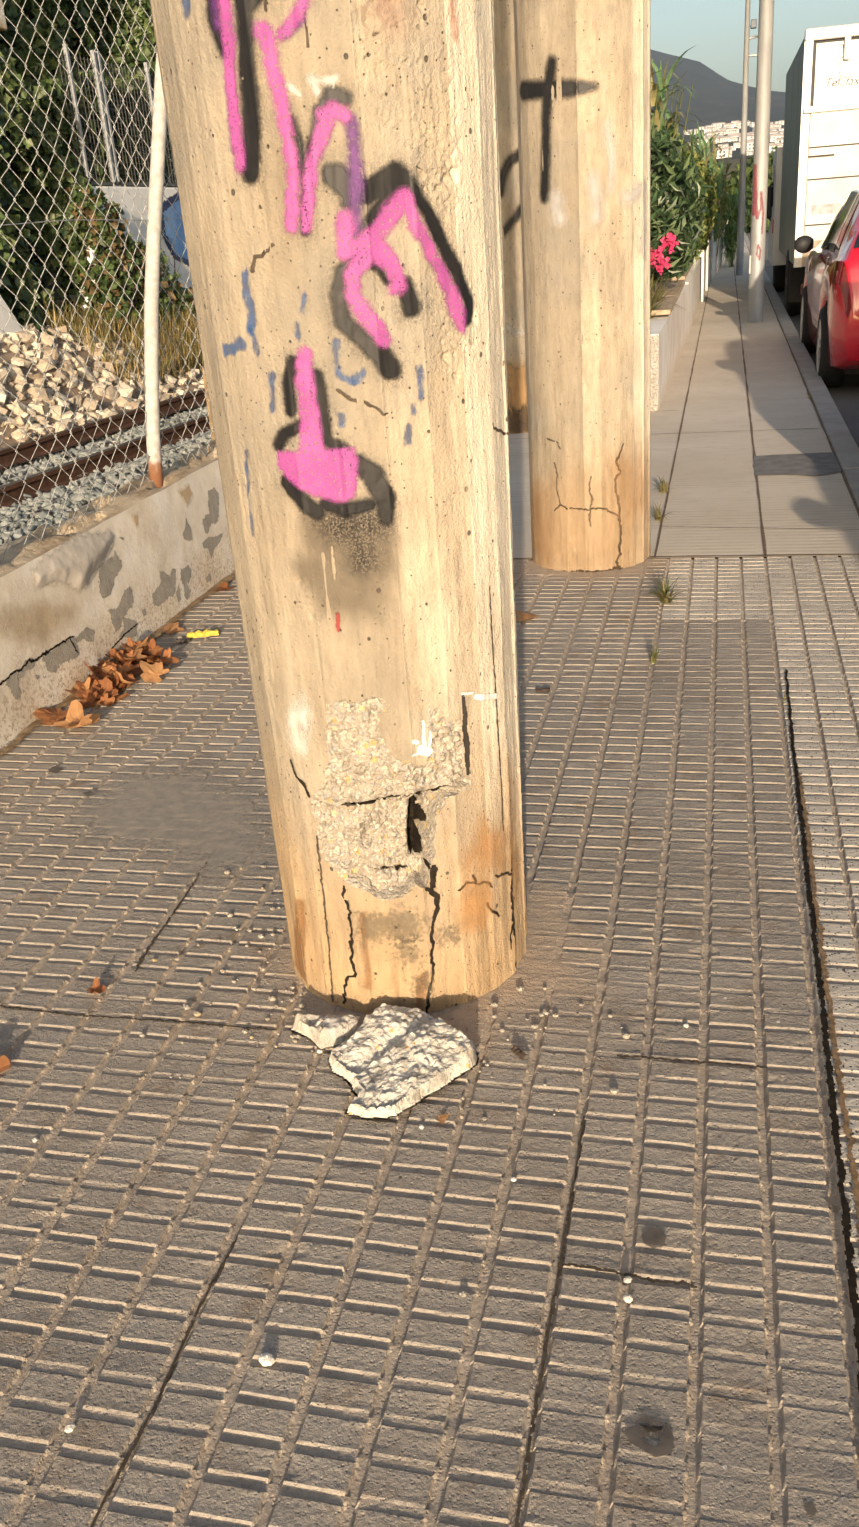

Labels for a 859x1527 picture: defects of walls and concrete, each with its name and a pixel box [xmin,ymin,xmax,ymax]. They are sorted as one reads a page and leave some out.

crack [492,423,508,435]
flaking render [98,488,223,638]
crack [547,438,624,572]
flaking render [5,627,94,700]
crack [0,623,138,685]
crack [290,760,310,798]
spalling [308,695,472,901]
crack [425,587,516,1013]
crack [316,835,357,1004]